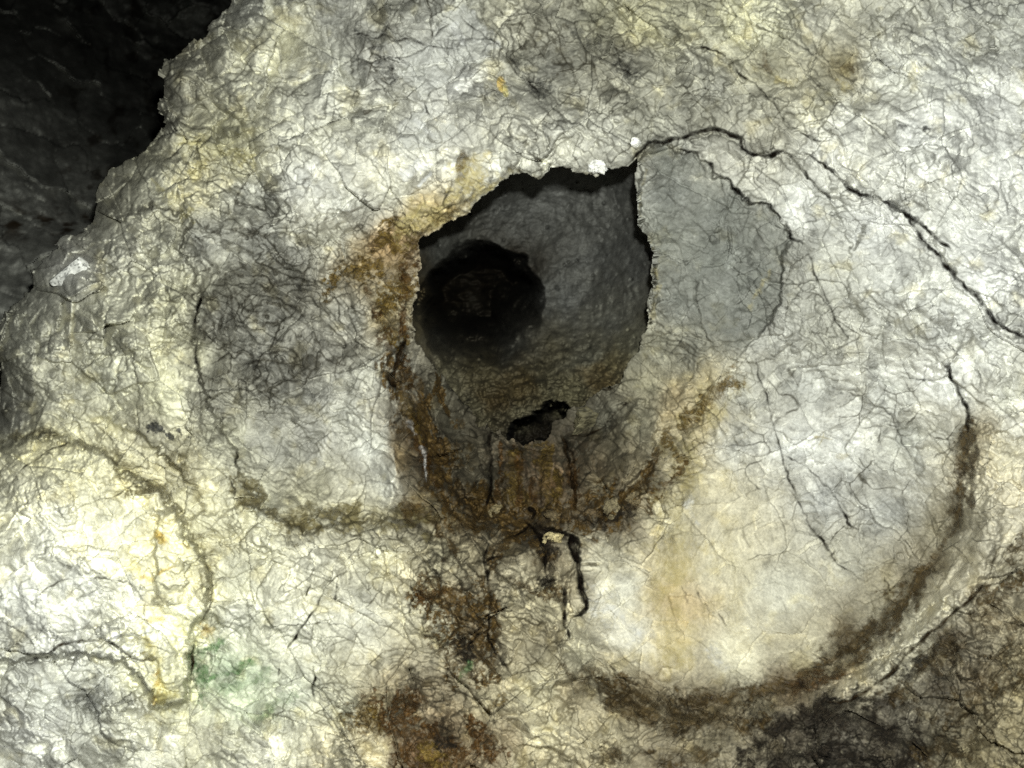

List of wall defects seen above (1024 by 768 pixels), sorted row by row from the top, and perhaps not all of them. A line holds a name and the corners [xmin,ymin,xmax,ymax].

peeling [399,161,432,187]
crack [633,46,1024,338]
crack [486,432,495,505]
water stain [375,351,745,600]
crack [562,428,602,504]
water stain [969,445,979,475]
crack [514,507,596,637]
water stain [406,572,504,689]
water stain [585,668,646,718]
water stain [792,644,875,694]